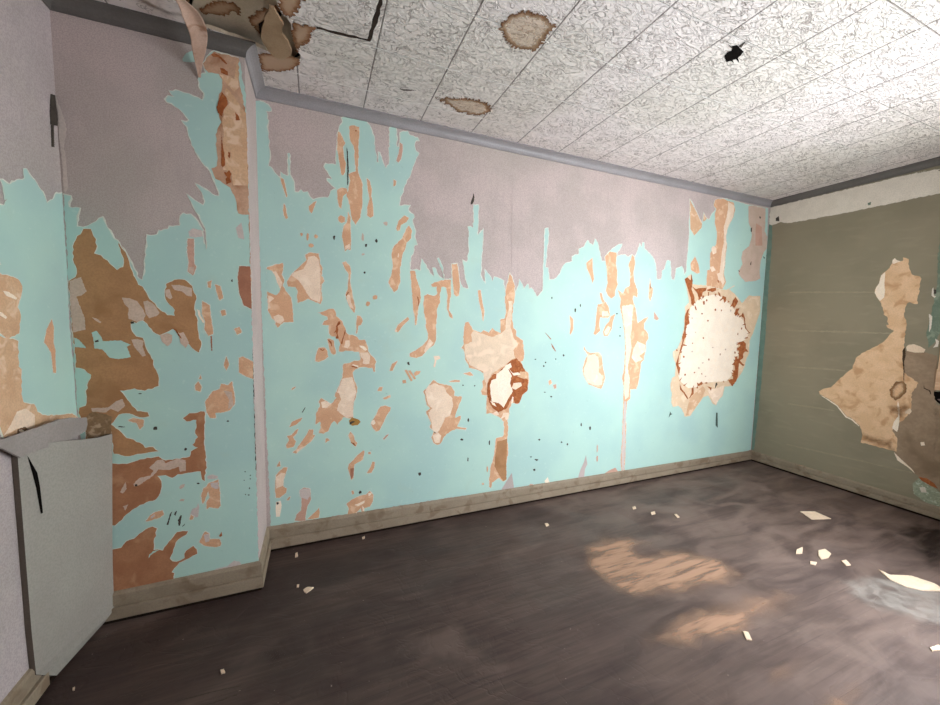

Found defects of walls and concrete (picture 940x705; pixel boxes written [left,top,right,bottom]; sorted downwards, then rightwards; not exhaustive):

water stain [199,0,316,72]
water stain [498,10,556,52]
water stain [435,96,492,116]
peeling [0,50,940,591]